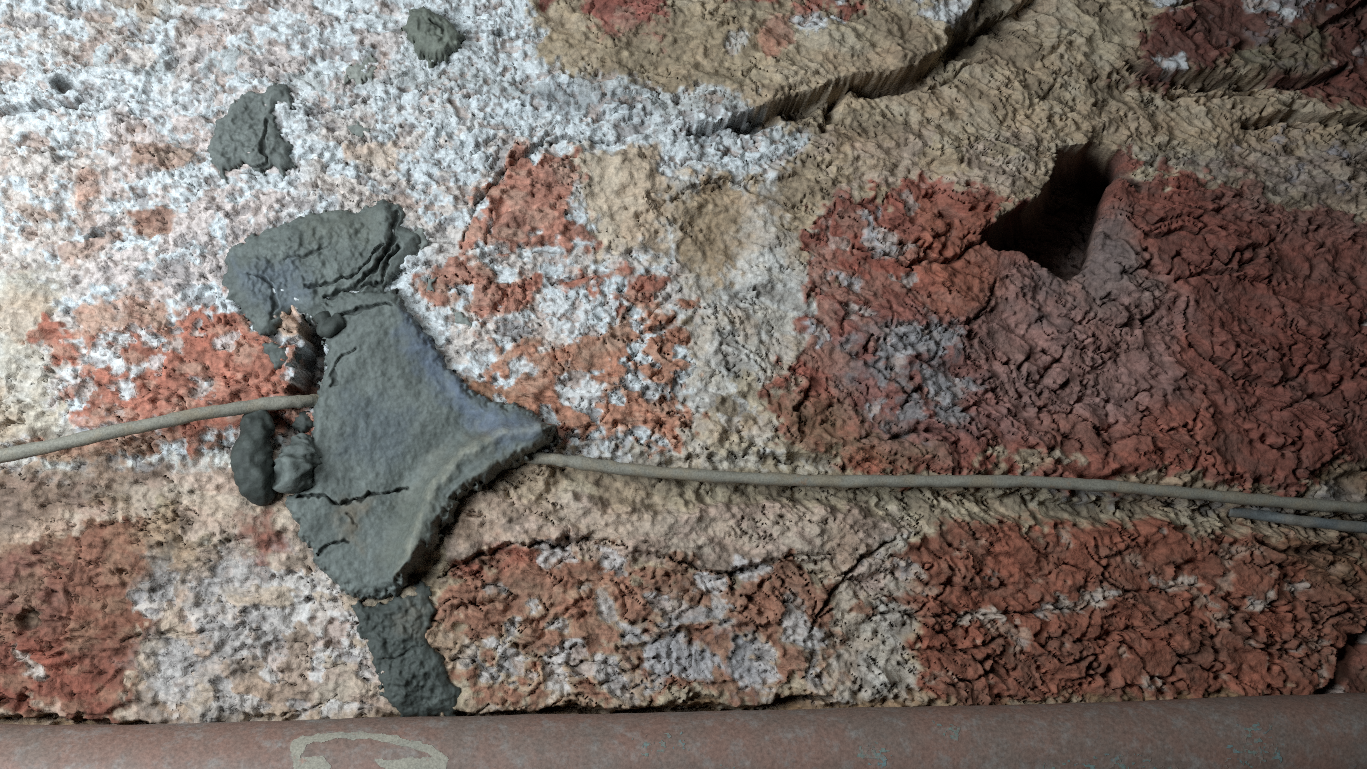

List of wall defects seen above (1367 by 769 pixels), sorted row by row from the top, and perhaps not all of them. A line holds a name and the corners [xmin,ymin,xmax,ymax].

peeling [563,0,677,43]
peeling [723,28,753,56]
peeling [789,0,846,35]
peeling [884,0,978,37]
crack [1182,0,1203,8]
crack [1317,0,1367,34]
crack [1125,58,1367,132]
crack [437,534,898,624]
spalling [0,503,240,724]
spalling [301,595,367,666]
spalling [429,513,1367,715]